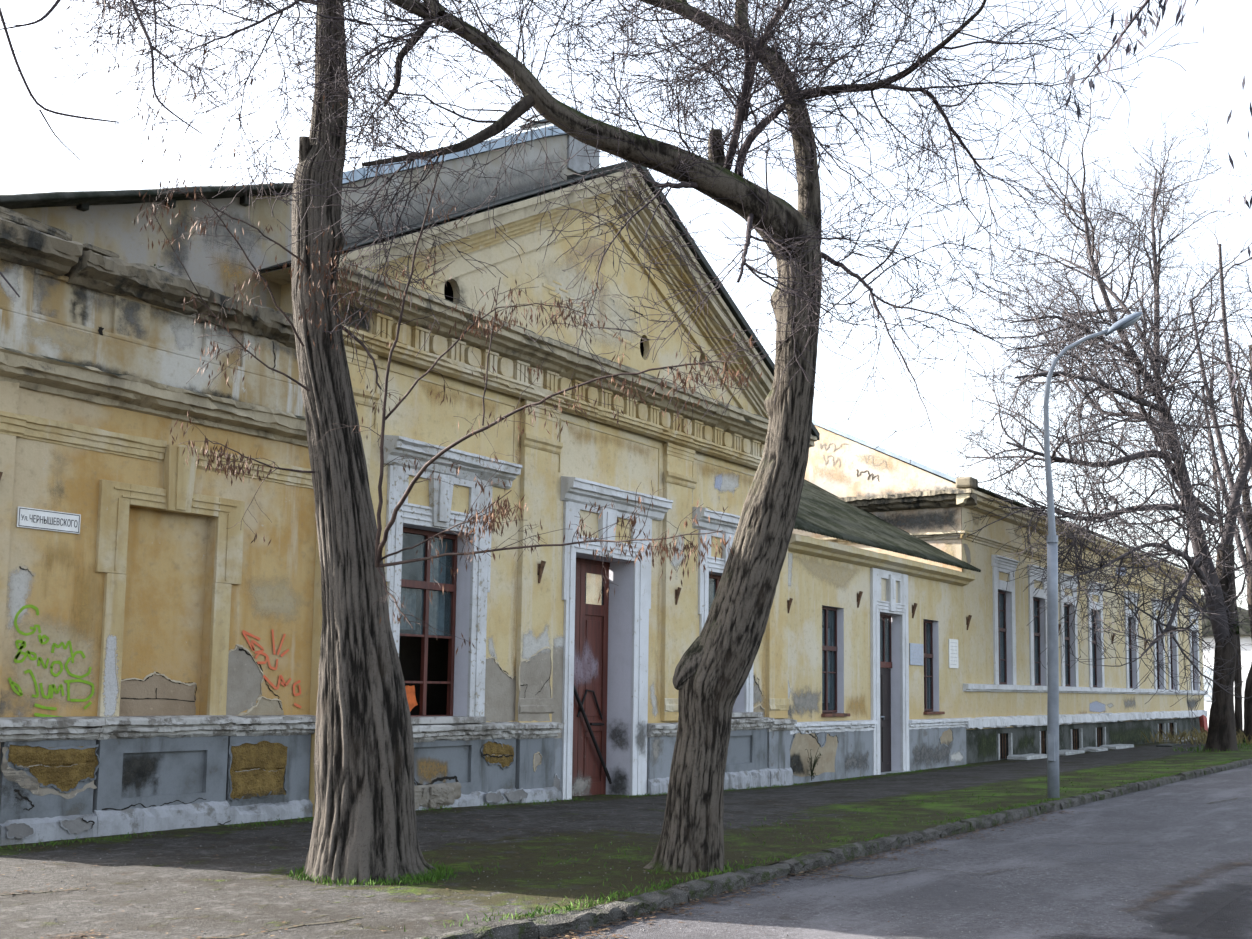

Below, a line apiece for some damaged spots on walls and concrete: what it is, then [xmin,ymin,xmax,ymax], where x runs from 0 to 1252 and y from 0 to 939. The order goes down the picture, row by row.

spalling [103,635,197,716]
flaking render [226,644,284,716]
flaking render [484,636,564,739]
spalling [1,742,101,799]
spalling [228,741,288,802]
spalling [480,740,515,770]
flaking render [790,730,838,777]